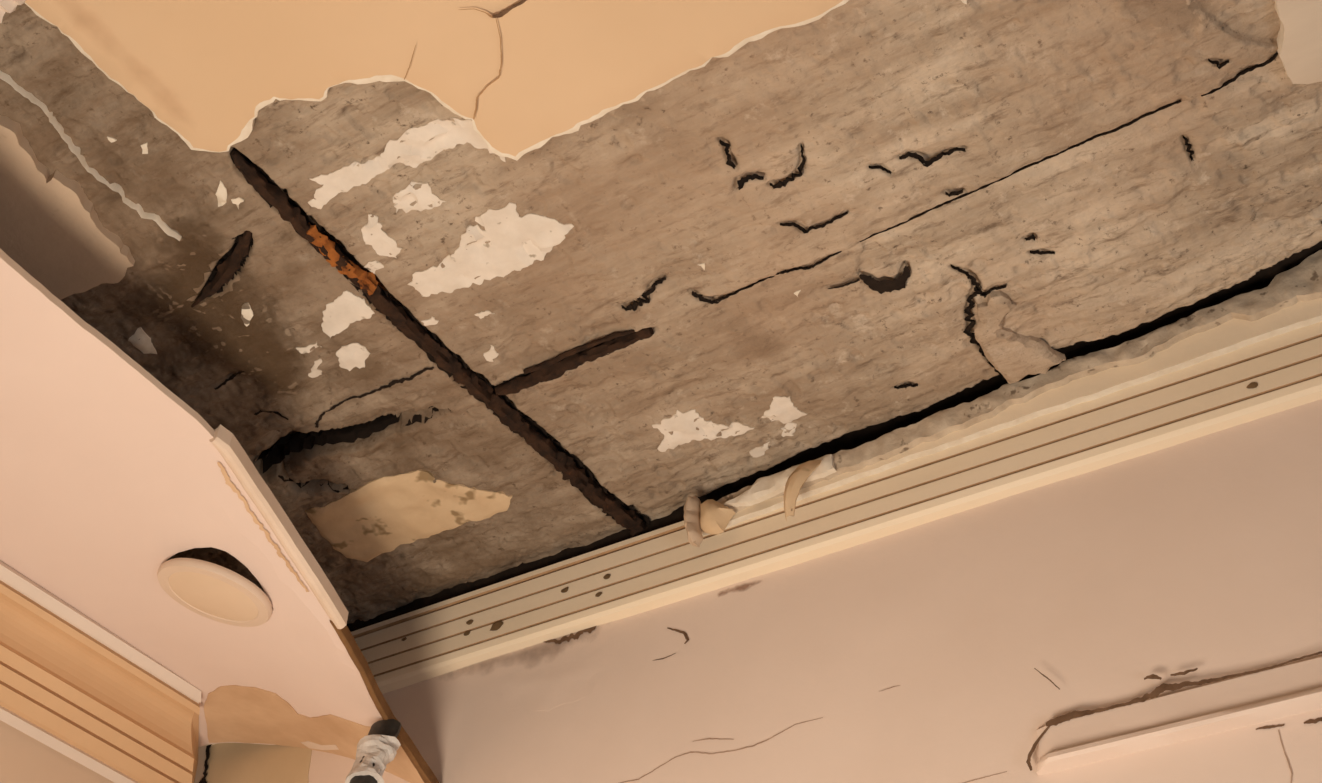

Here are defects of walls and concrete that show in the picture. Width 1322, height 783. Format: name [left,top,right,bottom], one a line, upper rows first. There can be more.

crack [459,0,527,120]
crack [621,52,1278,311]
spalling [0,0,1322,624]
crack [951,265,1006,380]
crack [894,382,918,390]
crack [621,717,823,783]
crack [964,651,1322,783]